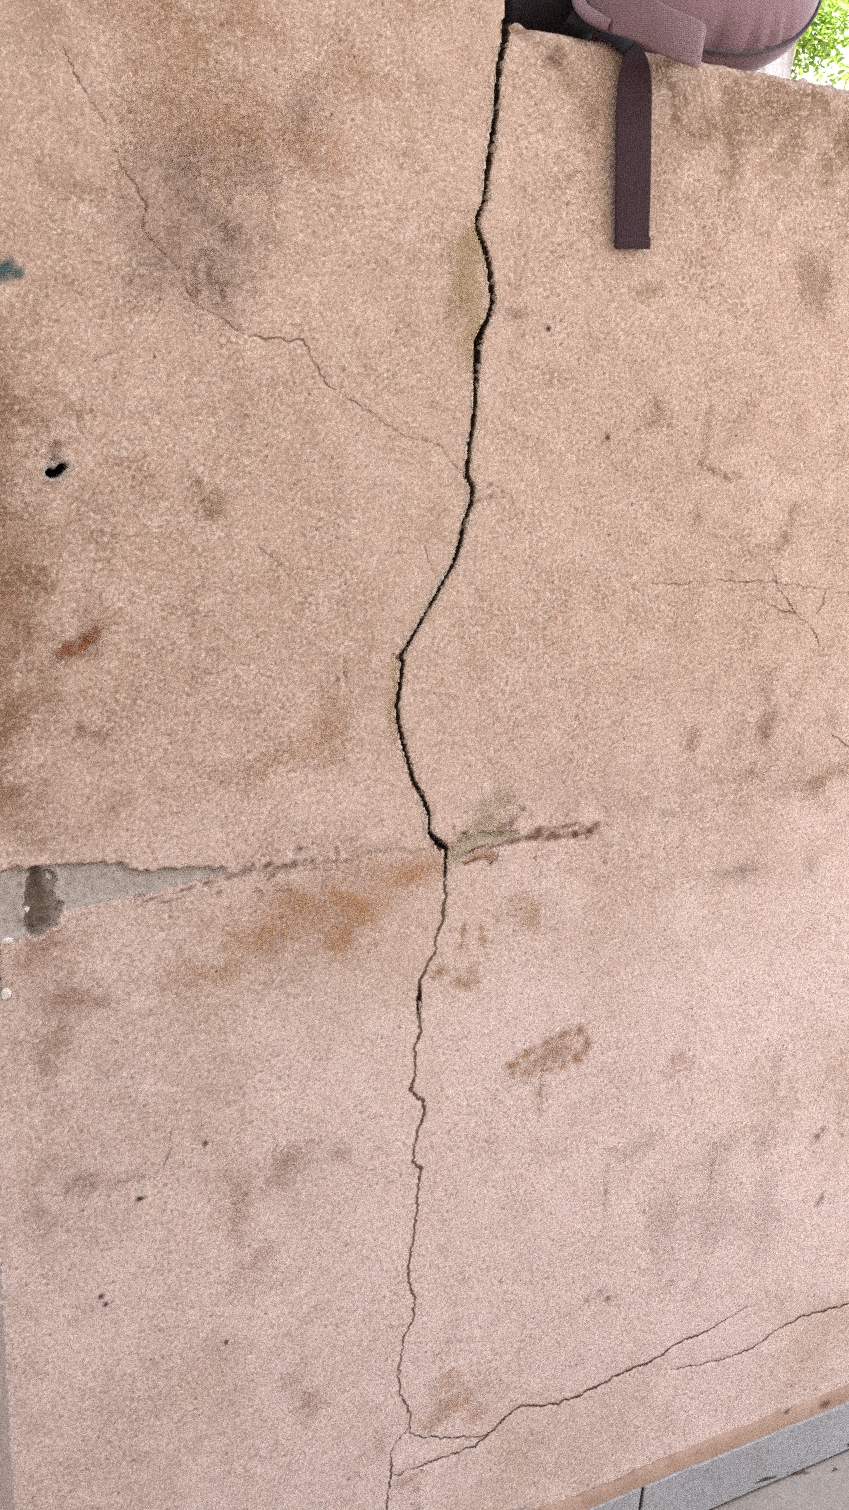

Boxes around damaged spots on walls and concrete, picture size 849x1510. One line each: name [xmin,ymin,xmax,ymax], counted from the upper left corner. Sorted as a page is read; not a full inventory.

crack [65,48,106,126]
crack [121,165,165,255]
crack [185,23,849,1510]
spalling [0,861,227,944]
spalling [0,988,12,1001]